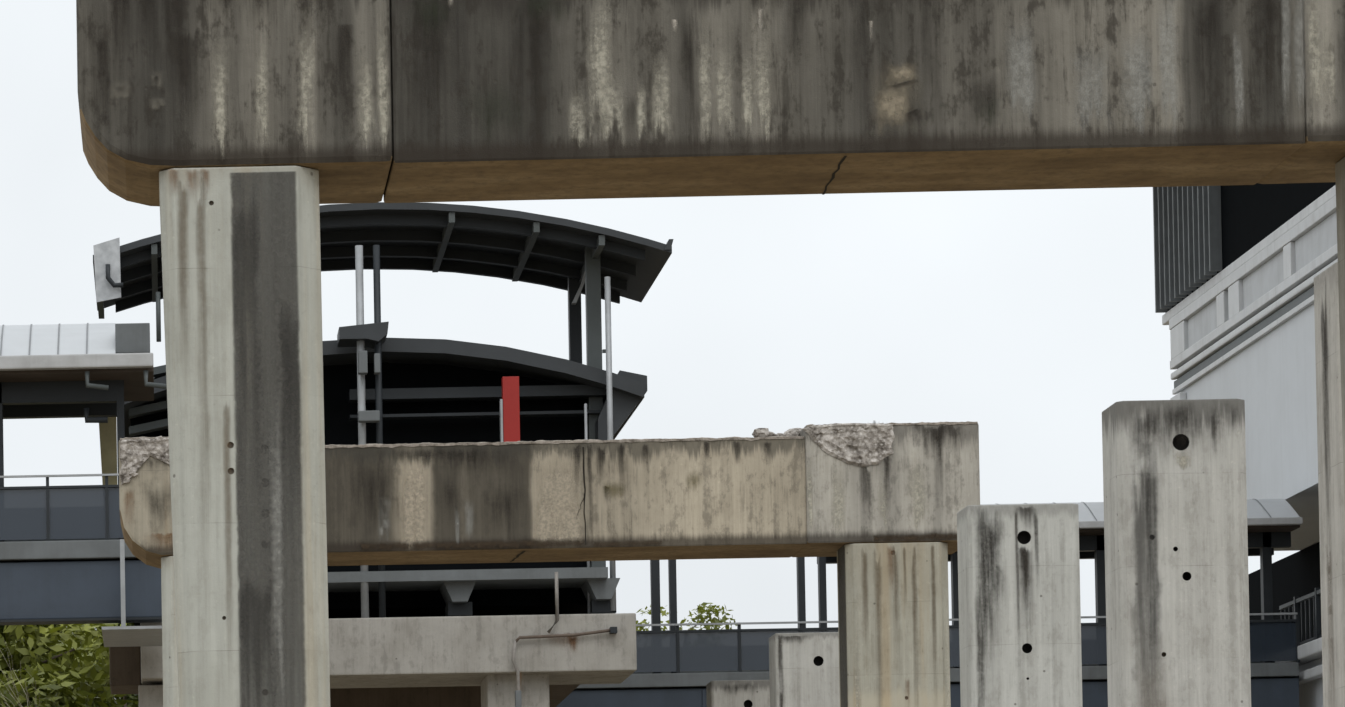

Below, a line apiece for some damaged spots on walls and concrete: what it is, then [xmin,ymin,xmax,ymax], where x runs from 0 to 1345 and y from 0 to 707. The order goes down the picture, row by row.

leakage [216,72,225,147]
leakage [362,58,387,140]
leakage [592,29,621,134]
leakage [688,48,769,130]
crack [822,156,847,195]
spalling [120,436,170,485]
leakage [226,172,305,707]
leakage [361,452,662,550]
spalling [802,423,895,467]
leakage [874,474,957,571]
leakage [922,425,956,457]
leakage [1015,507,1038,607]